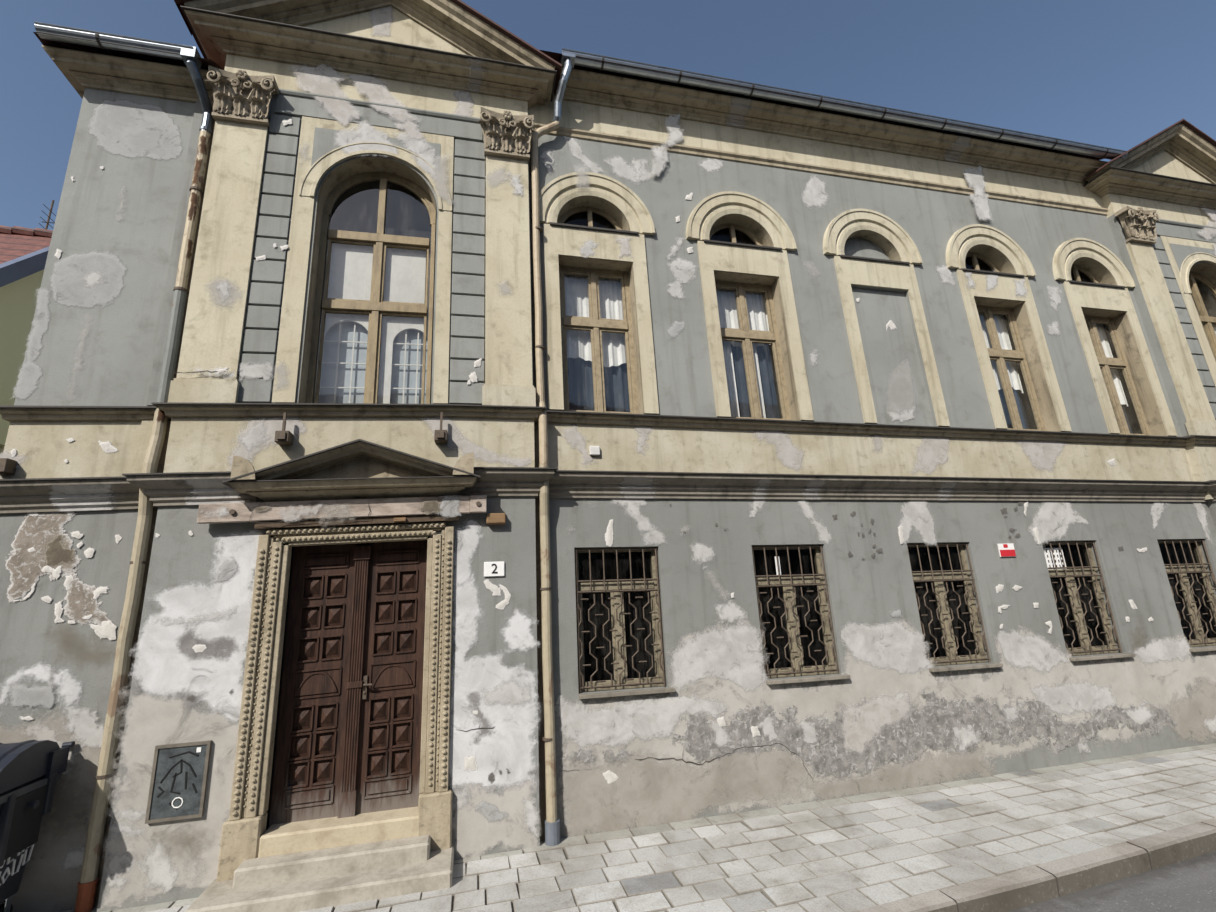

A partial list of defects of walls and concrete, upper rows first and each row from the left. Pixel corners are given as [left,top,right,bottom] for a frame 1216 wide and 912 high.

rust [188,135,206,221]
peeling [397,132,437,181]
peeling [13,289,51,399]
peeling [604,519,613,547]
peeling [612,498,665,545]
peeling [5,511,117,640]
peeling [484,579,511,610]
flaking render [554,584,1216,838]
flaking render [452,780,539,860]